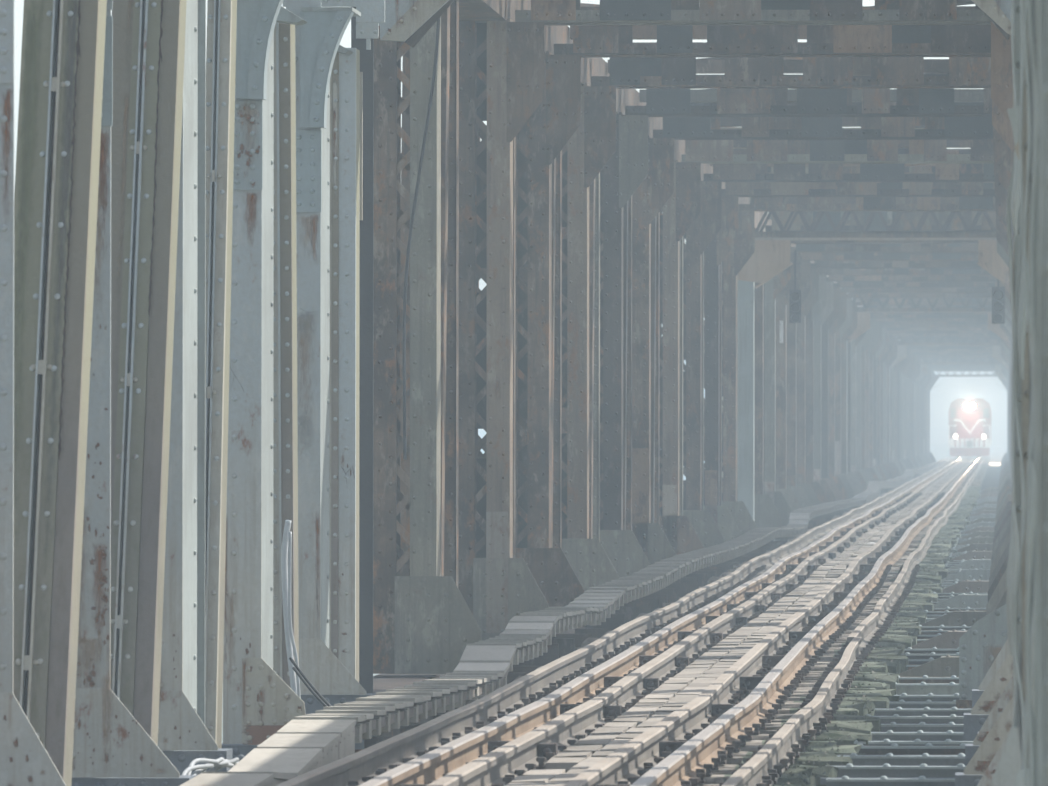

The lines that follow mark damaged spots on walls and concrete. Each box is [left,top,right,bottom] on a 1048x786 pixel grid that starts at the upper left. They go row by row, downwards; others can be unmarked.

corrosion [97,132,108,236]
corrosion [236,106,260,224]
corrosion [78,517,117,718]
corrosion [224,521,284,745]